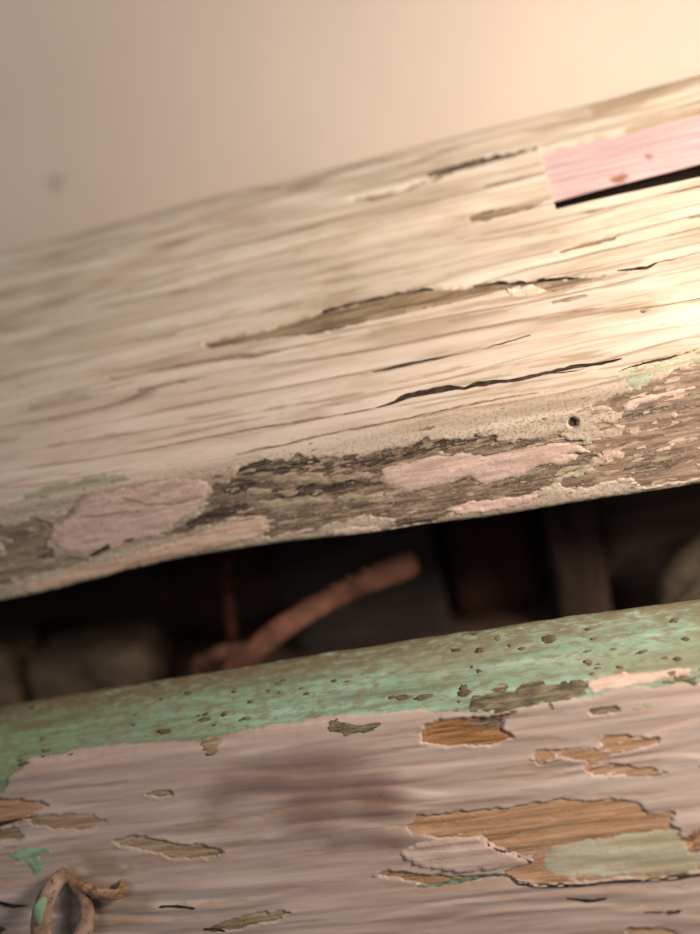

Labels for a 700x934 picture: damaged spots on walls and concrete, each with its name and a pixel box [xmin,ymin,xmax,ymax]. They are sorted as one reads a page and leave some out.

peeling [204,277,602,348]
crack [144,358,622,455]
peeling [0,347,700,593]
peeling [585,668,691,694]
peeling [421,714,512,746]
peeling [588,706,619,715]
peeling [530,735,668,779]
peeling [0,798,106,840]
peeling [373,798,700,888]